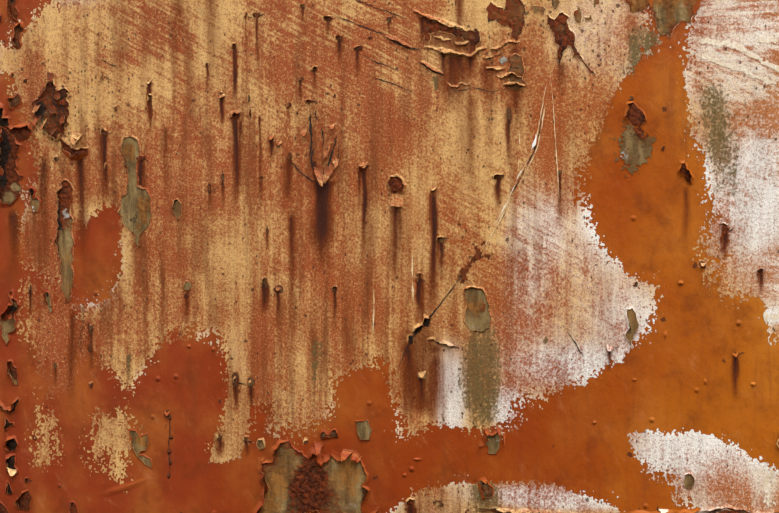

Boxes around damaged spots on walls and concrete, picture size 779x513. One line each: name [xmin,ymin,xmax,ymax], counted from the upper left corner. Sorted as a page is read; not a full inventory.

rust [206,42,282,202]
rust [261,213,295,313]
peeling [0,0,662,472]
rust [415,186,449,317]
crack [397,241,494,373]
rust [492,173,504,204]
peeling [624,0,779,345]
rust [719,222,733,252]
peeling [79,397,153,484]
peeling [253,437,371,513]
peeling [386,475,625,513]
peeling [627,427,779,513]